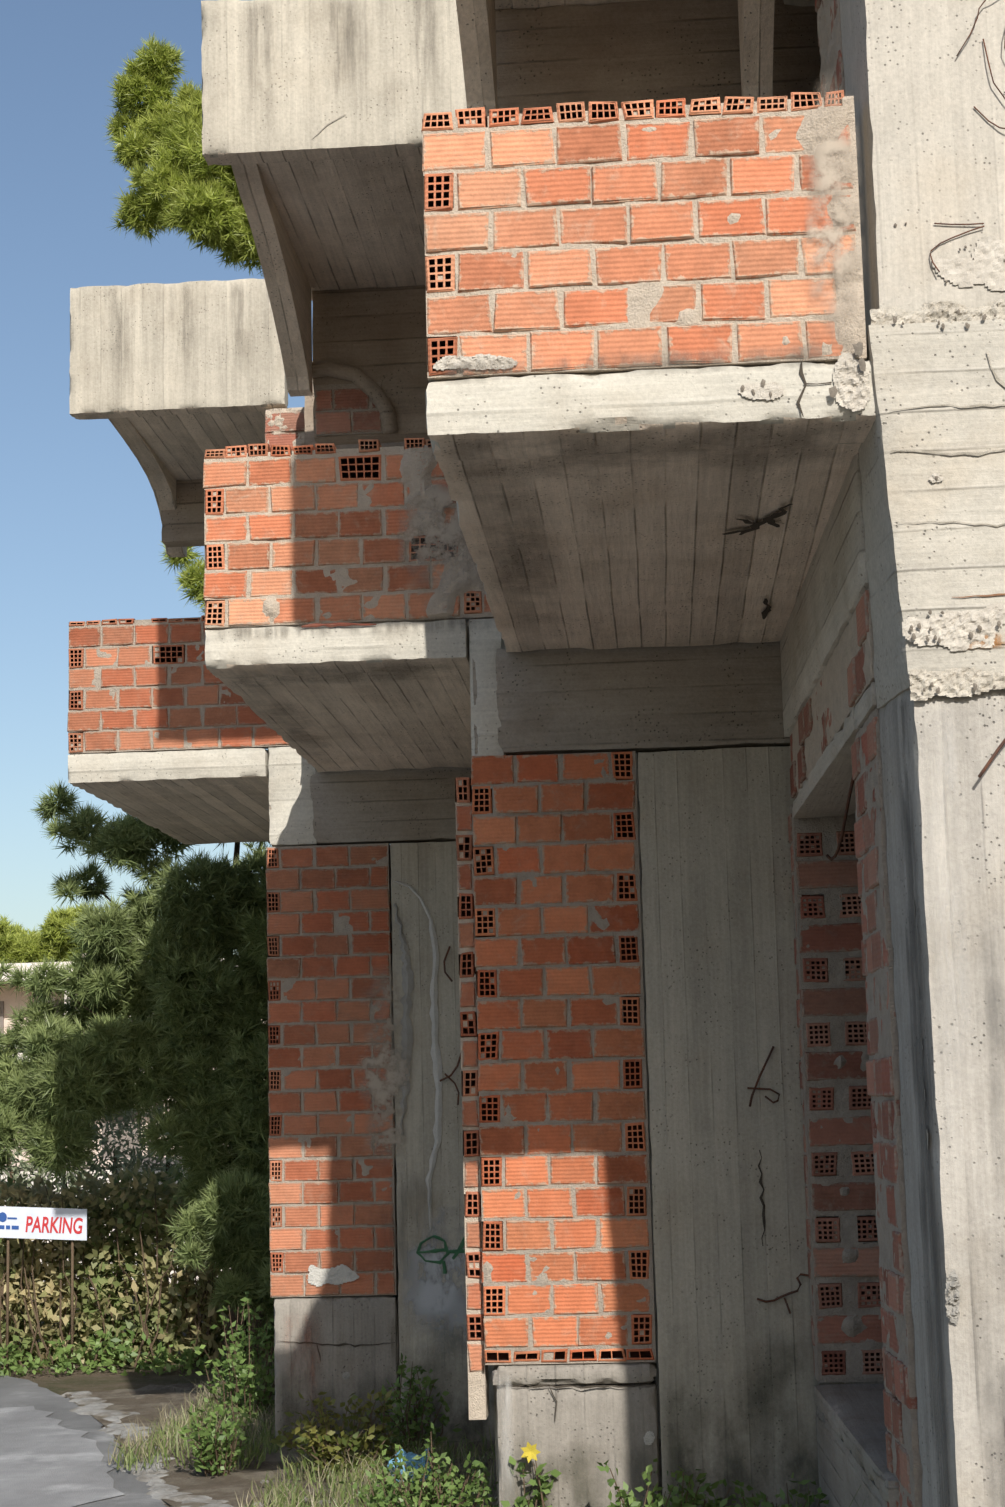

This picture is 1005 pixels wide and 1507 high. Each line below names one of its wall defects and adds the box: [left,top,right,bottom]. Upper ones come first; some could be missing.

spalling [932,235,1005,291]
crack [723,504,793,535]
spalling [902,603,1005,651]